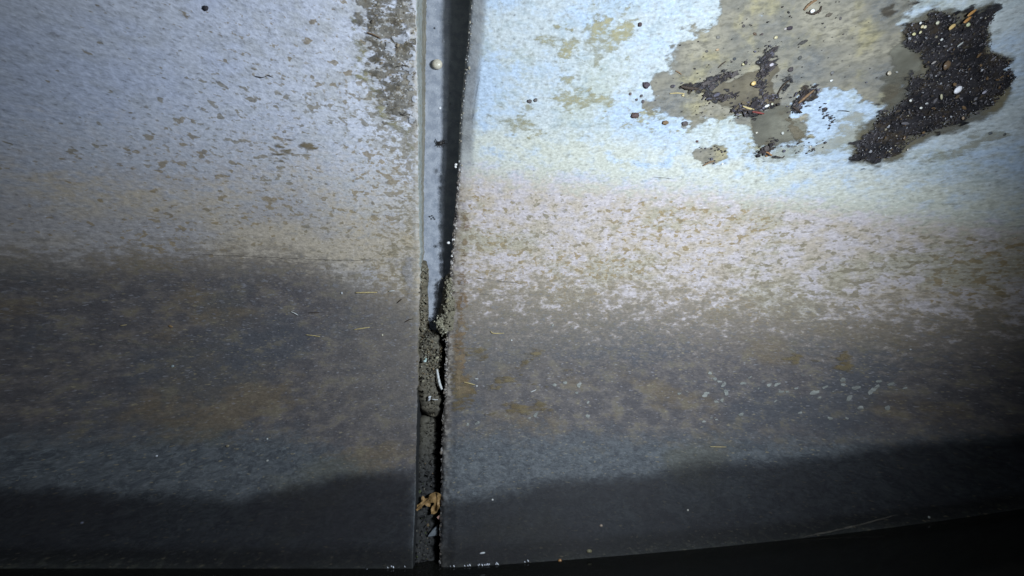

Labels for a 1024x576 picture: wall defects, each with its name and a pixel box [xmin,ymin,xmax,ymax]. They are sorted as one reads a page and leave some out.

spalling [351,0,418,128]
damp [536,4,638,66]
damp [624,0,1013,167]